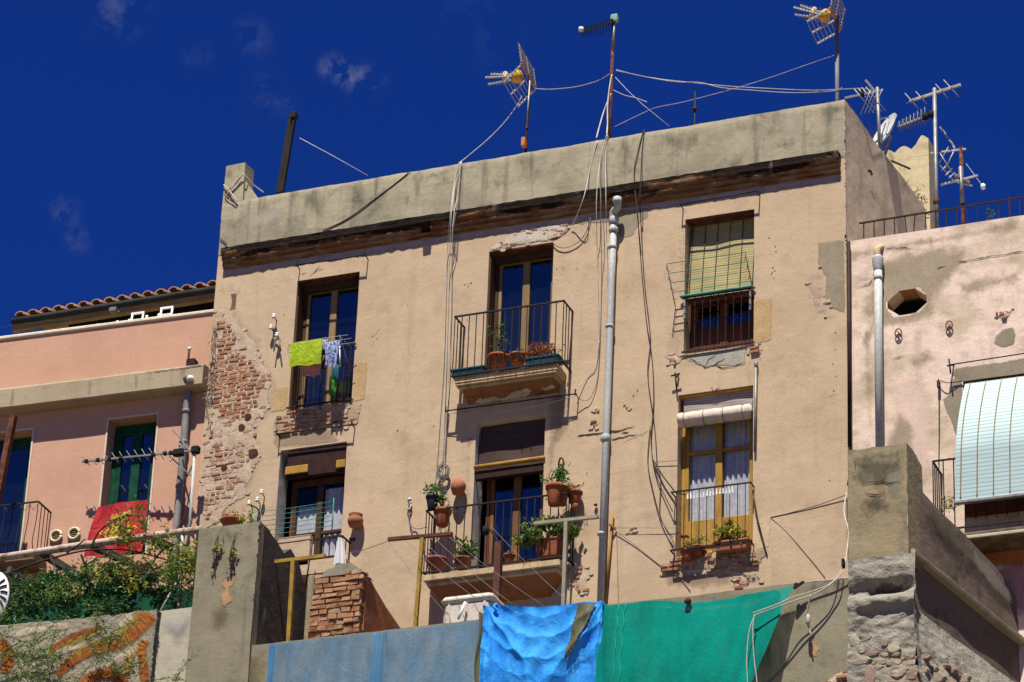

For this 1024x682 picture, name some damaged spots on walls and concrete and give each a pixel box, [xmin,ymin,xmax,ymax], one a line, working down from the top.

spalling [490,221,570,252]
peeling [474,385,555,405]
spalling [197,308,361,529]
spalling [660,547,766,590]